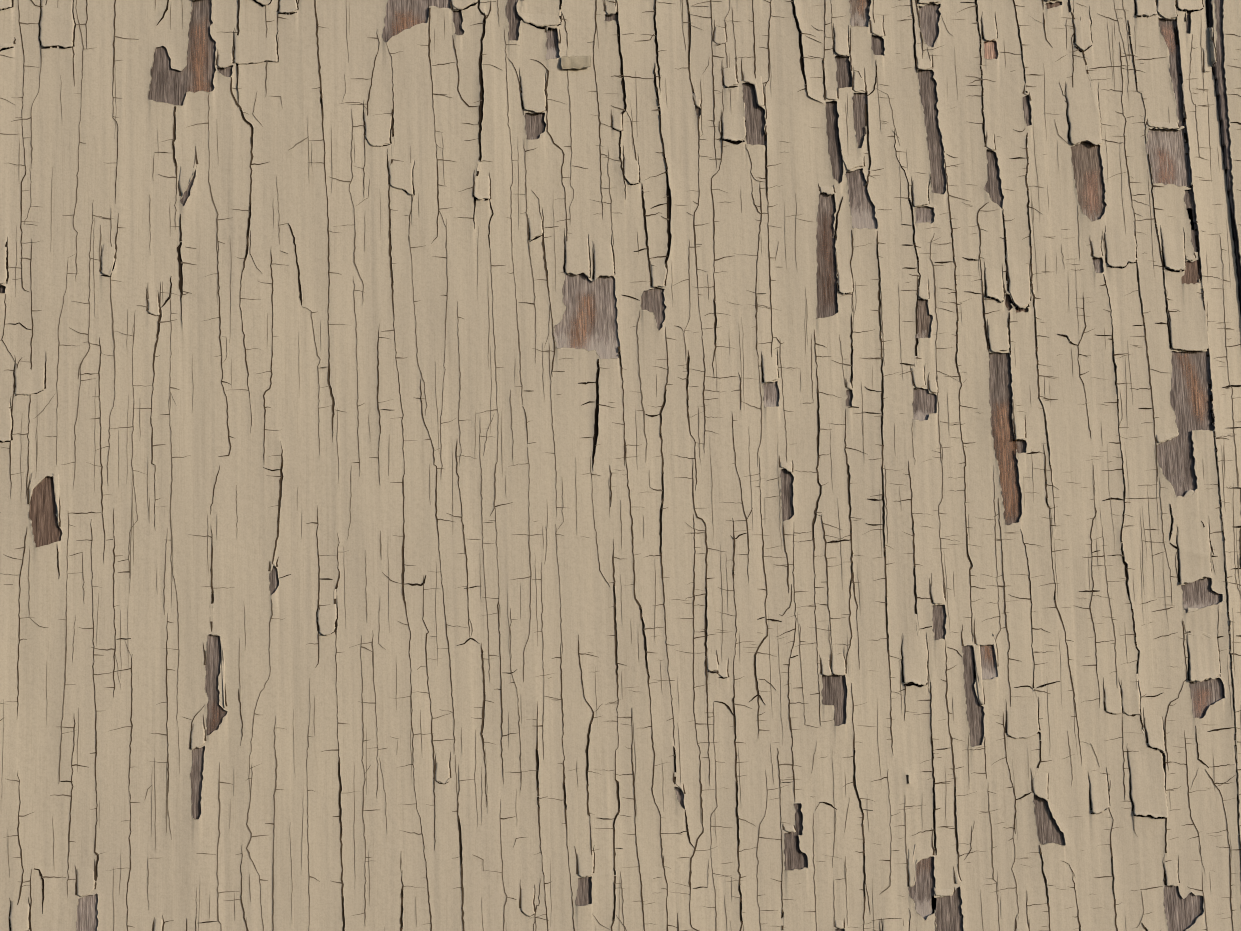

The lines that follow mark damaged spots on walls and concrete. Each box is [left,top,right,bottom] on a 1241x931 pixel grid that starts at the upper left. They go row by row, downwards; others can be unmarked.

crack [0,0,204,931]
peeling [148,0,299,106]
crack [341,35,403,137]
peeling [816,0,886,319]
peeling [911,0,946,223]
peeling [984,248,1032,525]
peeling [1134,0,1234,497]
peeling [189,604,228,819]
crack [163,599,294,931]
crack [294,698,315,770]
crack [290,780,320,925]
crack [322,610,390,931]